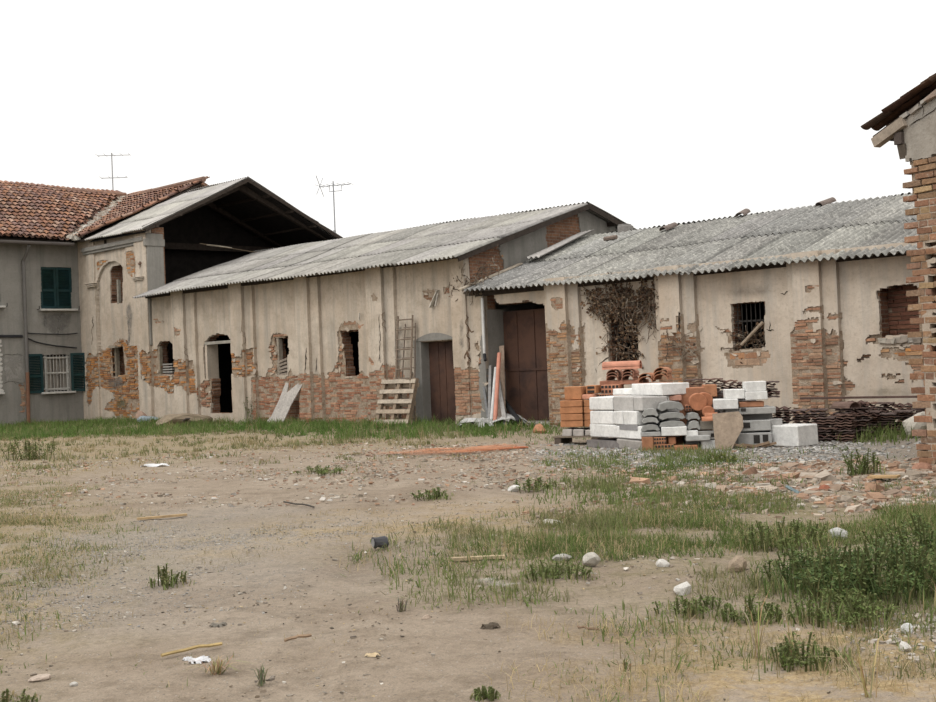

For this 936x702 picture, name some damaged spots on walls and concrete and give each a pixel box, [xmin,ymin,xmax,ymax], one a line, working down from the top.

spalling [550,297,563,311]
spalling [85,338,212,419]
spalling [231,321,416,424]
spalling [545,320,587,427]
spalling [657,314,705,387]
spalling [716,326,770,369]
spalling [790,287,925,417]